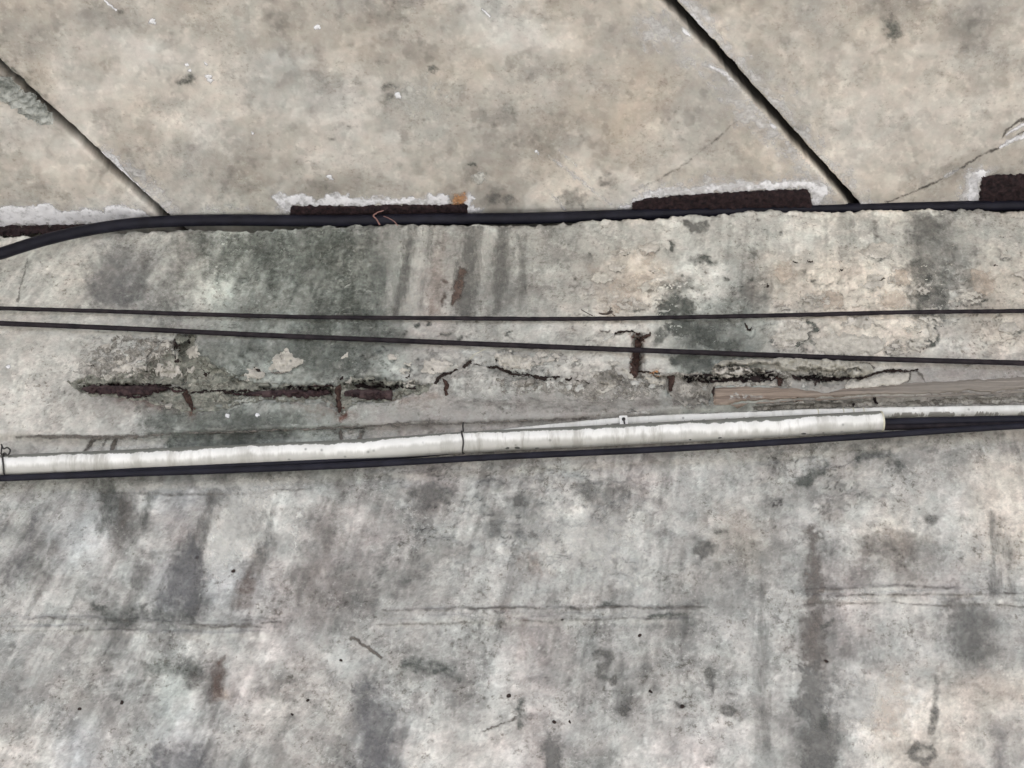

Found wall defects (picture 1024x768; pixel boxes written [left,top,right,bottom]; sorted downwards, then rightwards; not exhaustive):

damp [619,0,856,210]
efflorescence [0,203,149,227]
damp [272,192,513,213]
damp [441,226,508,316]
damp [655,284,738,374]
corrosion [81,383,185,399]
spalling [67,331,453,415]
corrosion [233,385,393,419]
crack [434,360,588,384]
spalling [494,334,863,407]
crack [863,364,924,382]
damp [790,527,876,768]